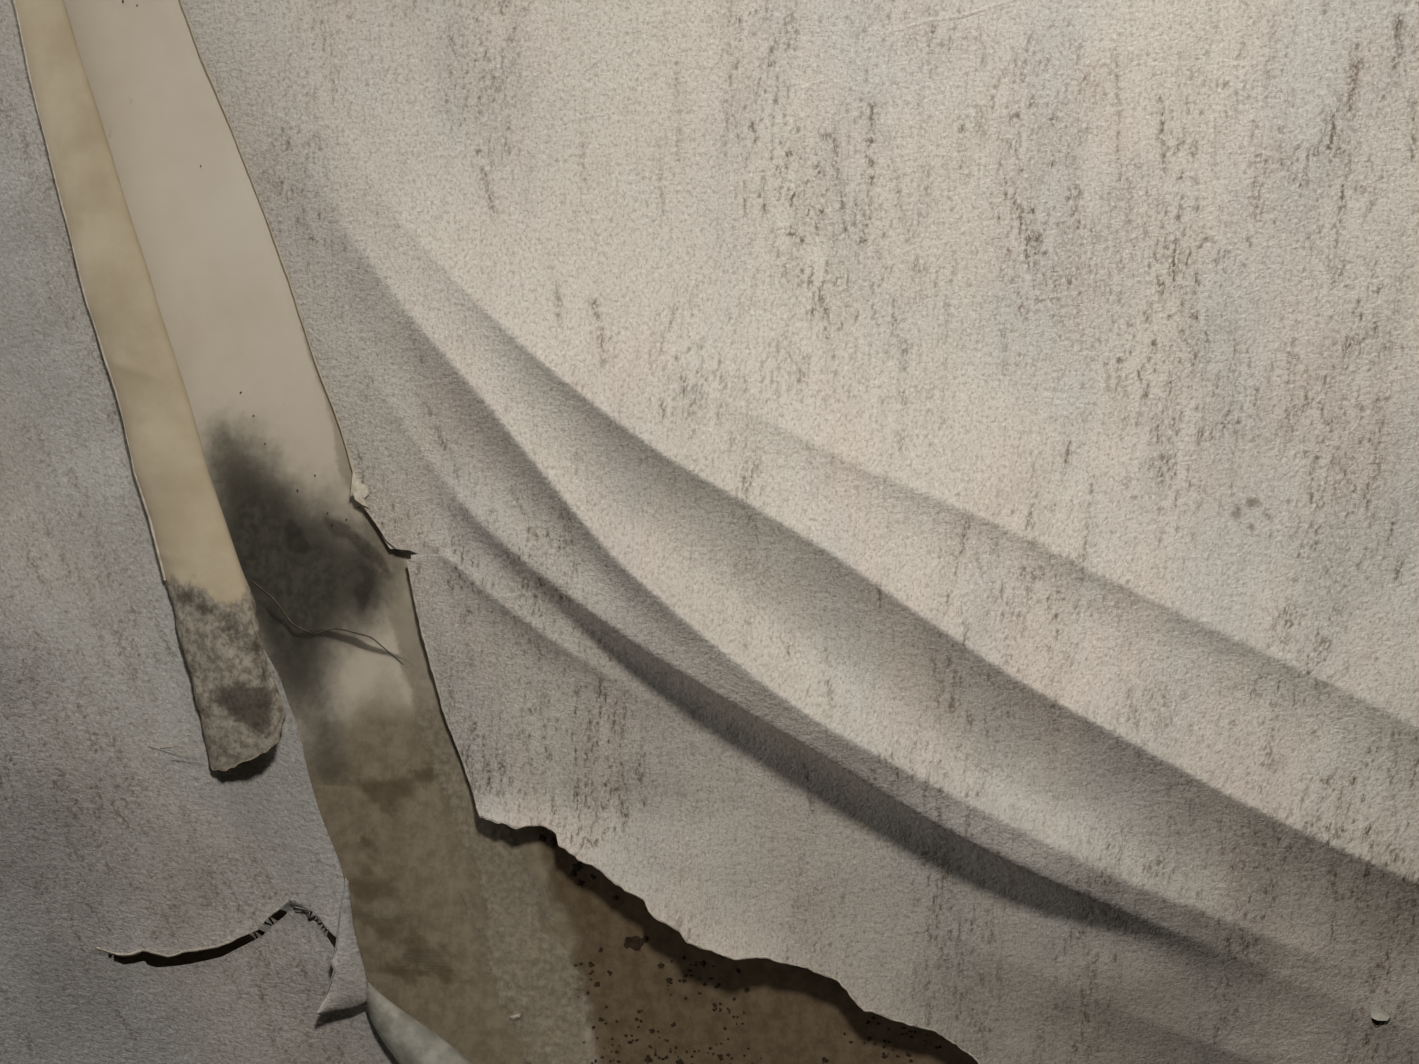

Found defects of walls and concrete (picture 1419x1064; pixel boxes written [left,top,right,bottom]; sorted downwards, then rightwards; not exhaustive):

damp [165,438,403,770]
peeling [350,471,370,508]
damp [259,909,287,935]
damp [306,711,531,1064]